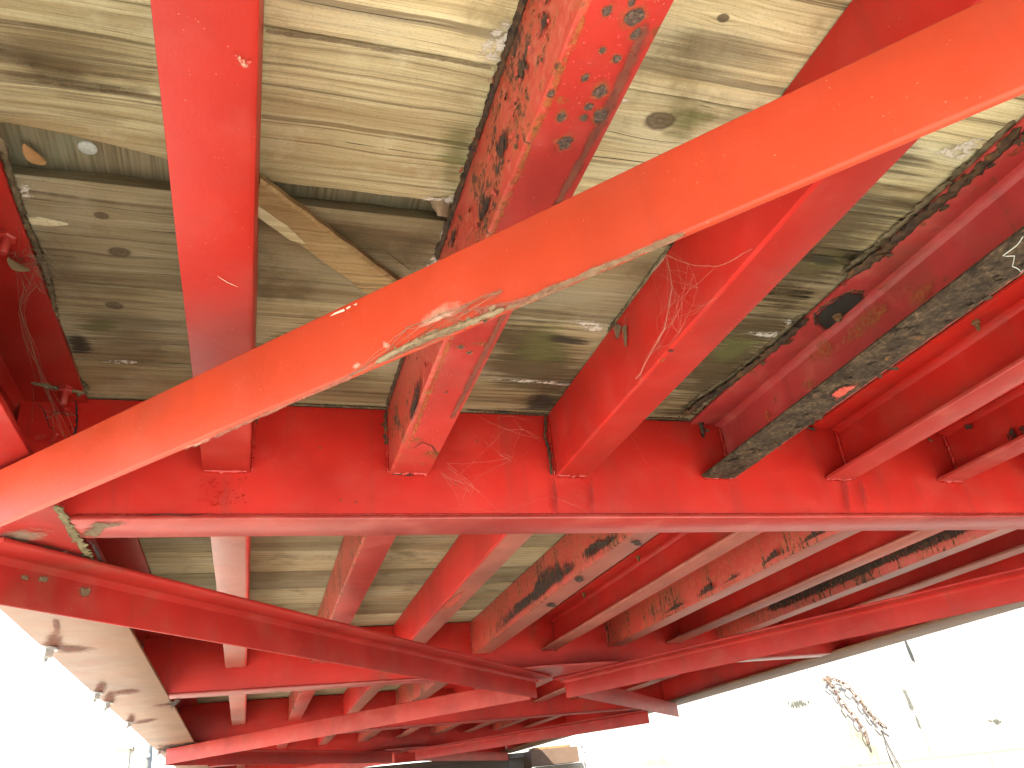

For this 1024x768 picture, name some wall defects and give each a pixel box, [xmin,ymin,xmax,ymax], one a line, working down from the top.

rust [432,0,528,259]
rust [554,0,648,205]
rust [842,127,1024,285]
peeling [404,383,421,421]
rust [451,290,552,418]
rust [497,536,616,629]
rust [664,574,737,614]
rust [768,530,970,611]